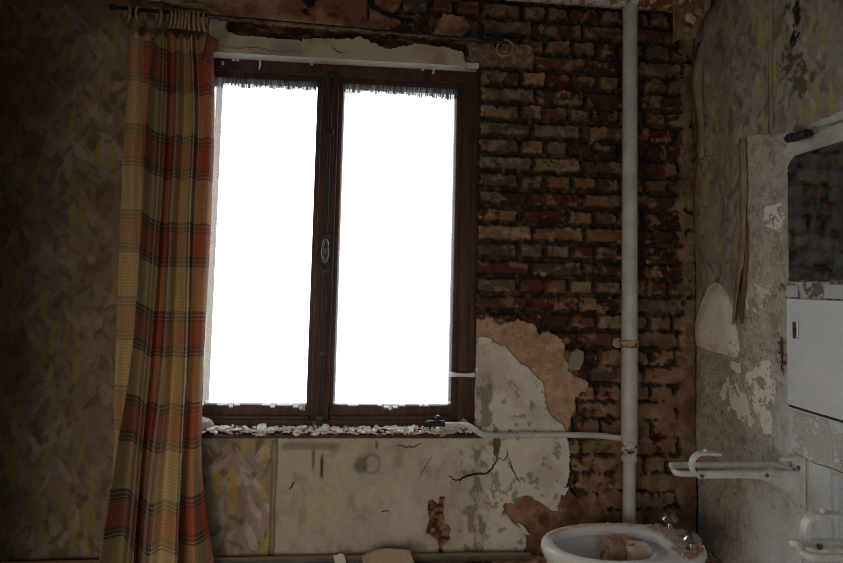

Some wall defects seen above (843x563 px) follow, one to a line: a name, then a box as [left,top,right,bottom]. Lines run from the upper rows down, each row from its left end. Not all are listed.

rust [610,0,689,13]
peeling [762,202,785,230]
flaking render [181,0,623,563]
flaking render [636,10,697,533]
peeling [719,332,787,435]
crack [397,443,433,478]
crack [449,450,520,483]
peeling [792,411,843,478]